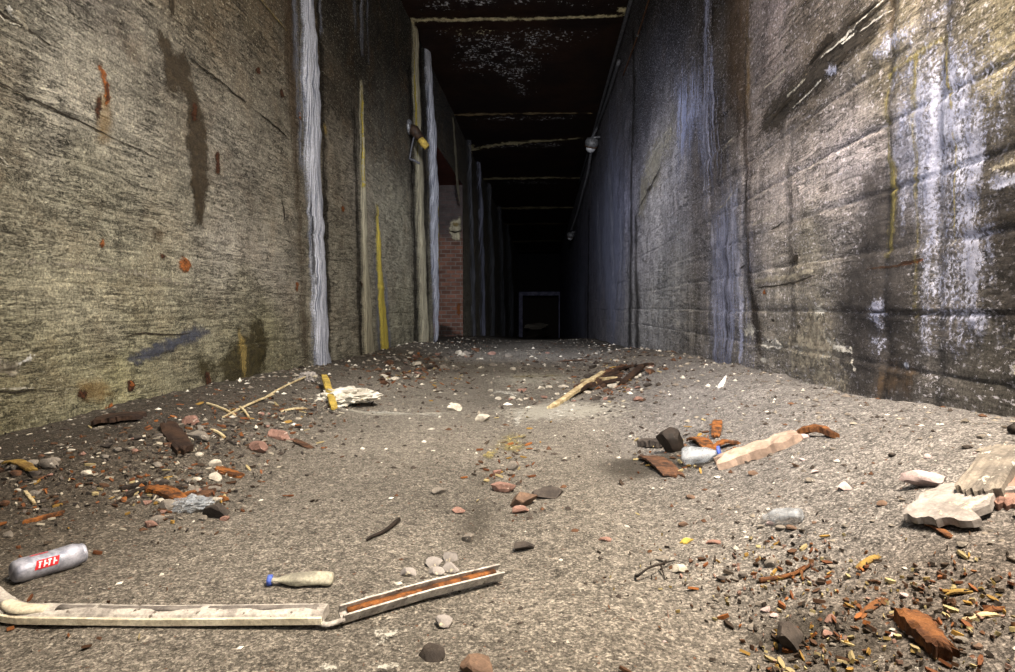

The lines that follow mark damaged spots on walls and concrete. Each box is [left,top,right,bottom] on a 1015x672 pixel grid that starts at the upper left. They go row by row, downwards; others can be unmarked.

corrosion [95,64,111,119]
corrosion [178,257,192,272]
damp [155,24,220,225]
damp [292,0,332,365]
damp [407,0,631,348]
damp [834,0,1015,399]